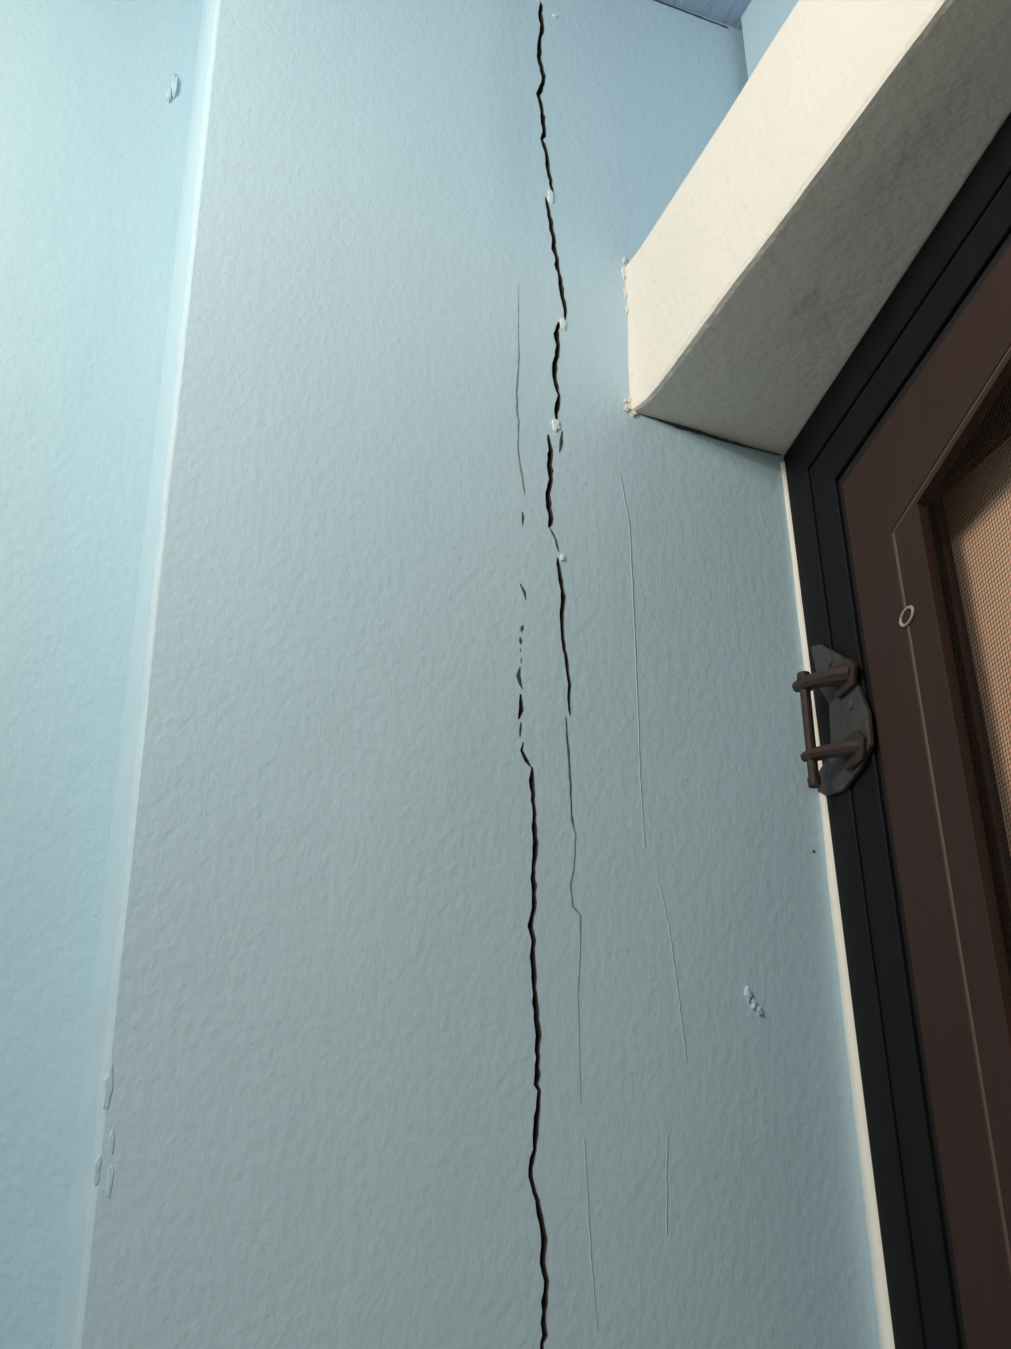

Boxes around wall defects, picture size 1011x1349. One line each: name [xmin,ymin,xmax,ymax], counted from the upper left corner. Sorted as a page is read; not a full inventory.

crack [655,0,729,28]
crack [516,583,549,1349]
crack [516,0,581,1101]
crack [610,457,687,1061]